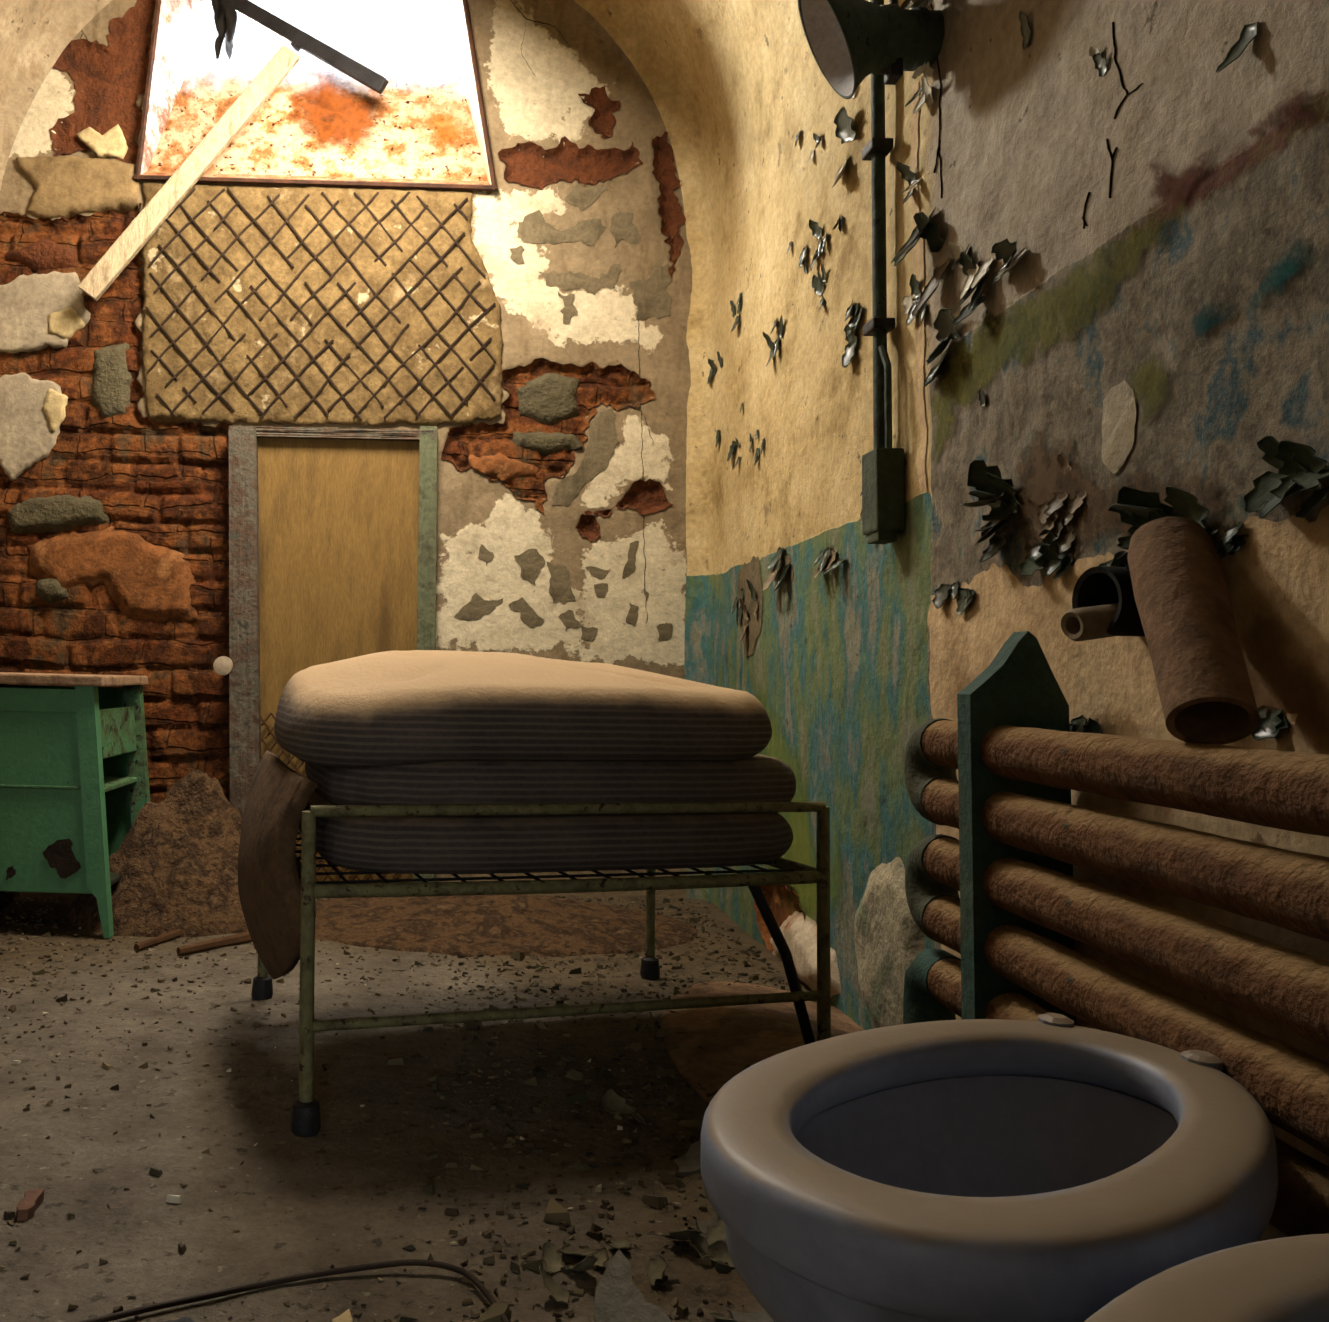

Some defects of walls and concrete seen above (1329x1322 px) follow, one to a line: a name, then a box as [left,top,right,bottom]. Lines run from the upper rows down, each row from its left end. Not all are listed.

flaking render [0,0,232,803]
flaking render [441,358,675,541]
flaking render [498,86,686,324]
peeling [786,215,842,311]
peeling [794,93,856,188]
peeling [842,300,863,368]
peeling [891,61,1028,492]
crack [1082,22,1143,229]
peeling [454,548,598,641]
peeling [585,541,639,597]
peeling [927,380,1329,755]
peeling [1071,790,1329,857]